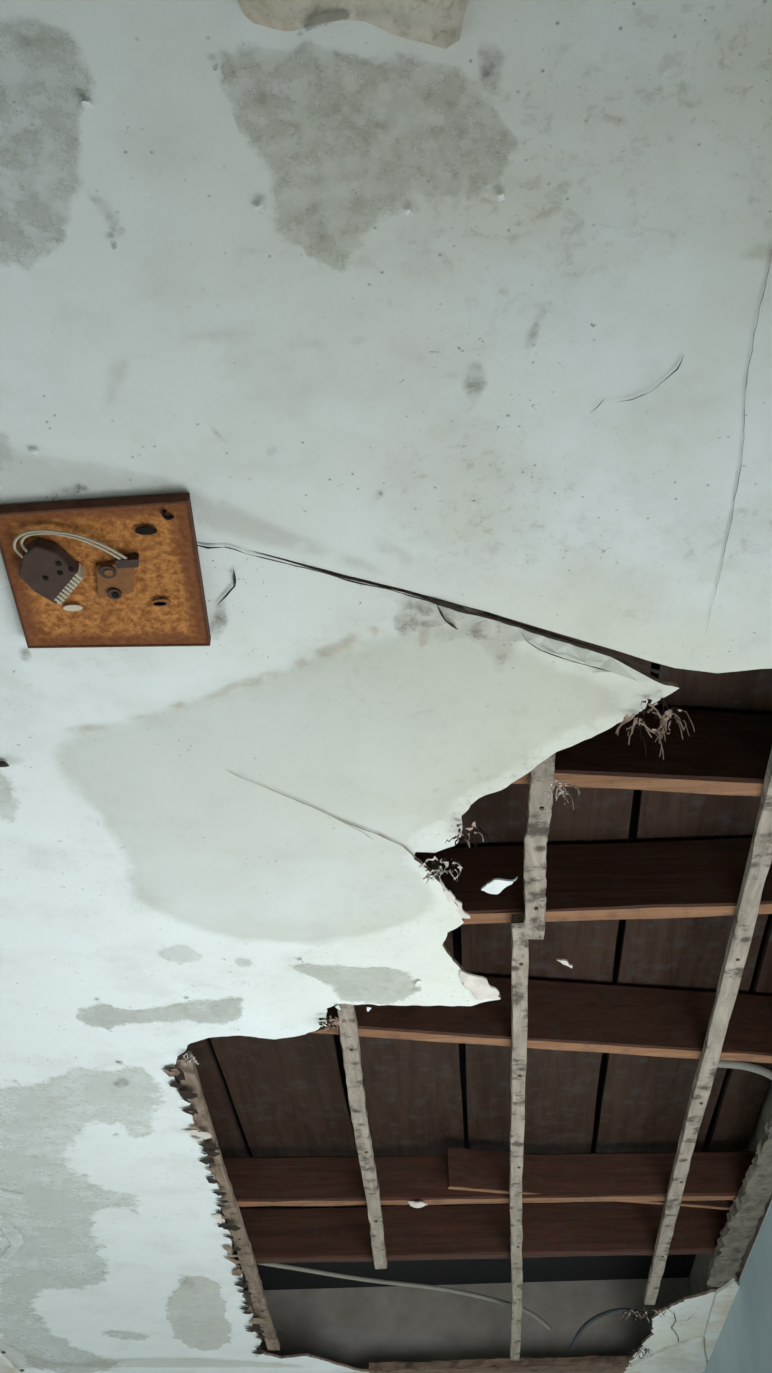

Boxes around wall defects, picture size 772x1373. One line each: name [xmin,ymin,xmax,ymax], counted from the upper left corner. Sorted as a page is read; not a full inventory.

crack [706,252,772,630]
crack [197,545,671,677]
peeling [440,880,470,919]
peeling [481,876,518,894]
peeling [294,961,423,1012]
peeling [460,970,499,1000]
peeling [163,1066,268,1357]